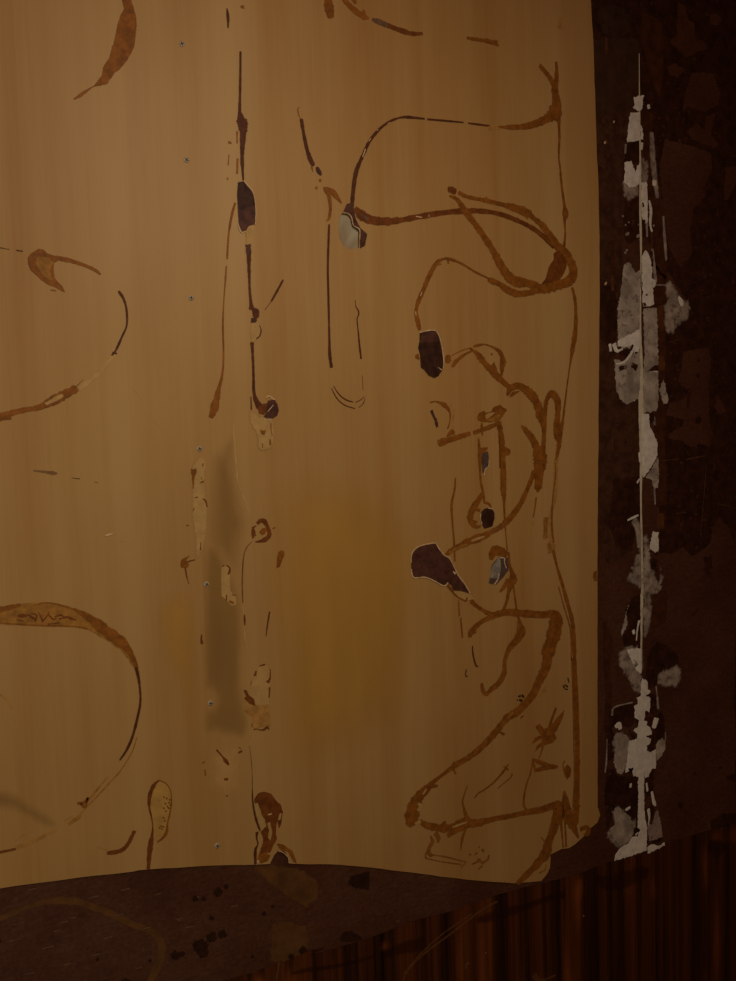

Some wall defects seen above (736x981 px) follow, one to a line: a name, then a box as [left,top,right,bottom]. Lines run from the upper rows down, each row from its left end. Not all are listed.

crack [226,5,244,28]
crack [227,51,248,180]
crack [557,117,569,246]
crack [0,290,128,421]
spalling [605,53,690,861]
peeling [411,542,473,601]
crack [543,287,581,825]
crack [107,831,136,855]